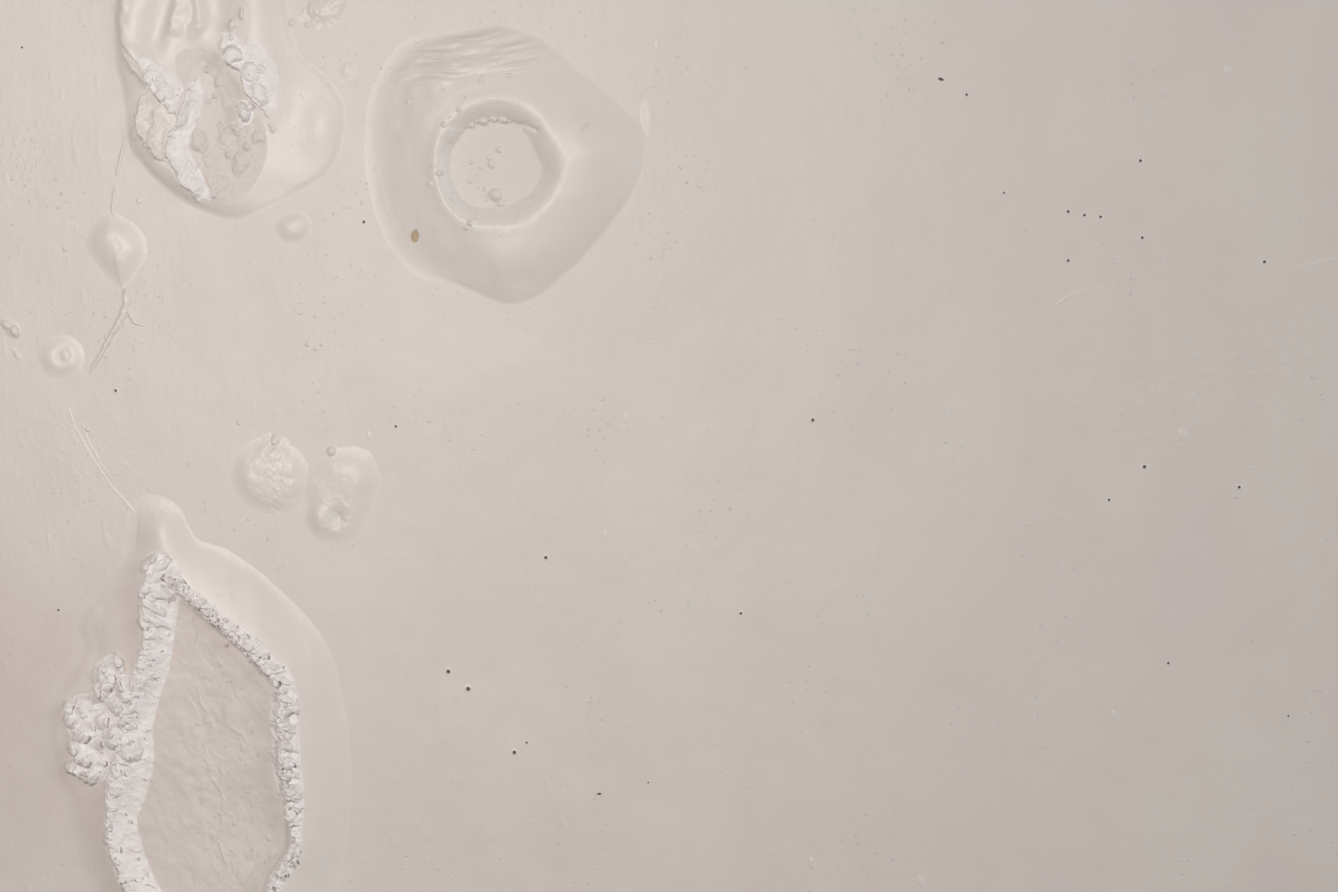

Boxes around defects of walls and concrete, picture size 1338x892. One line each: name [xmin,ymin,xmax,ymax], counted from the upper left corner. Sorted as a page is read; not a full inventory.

crack [90,287,146,373]